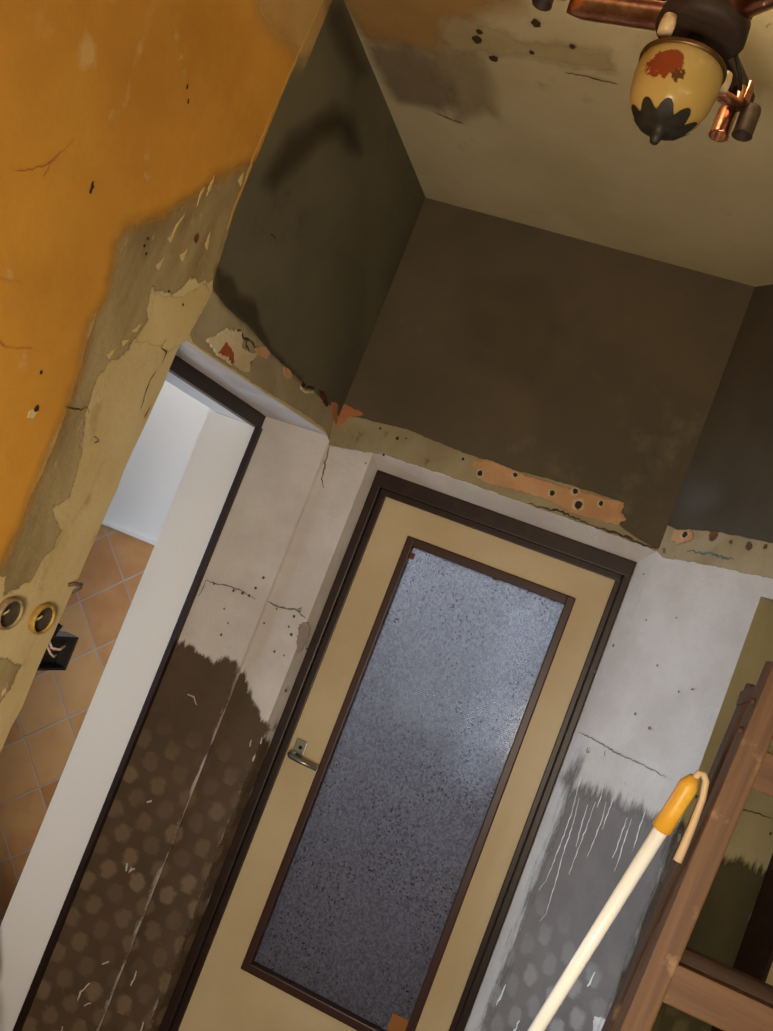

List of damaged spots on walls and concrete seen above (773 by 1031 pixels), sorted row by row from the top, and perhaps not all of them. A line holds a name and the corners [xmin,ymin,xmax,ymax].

damp [344,0,504,108]
crack [16,139,74,177]
flaking render [206,328,270,372]
peeling [0,162,254,594]
flaking render [462,458,626,525]
flaking render [671,529,694,545]
crack [198,580,306,619]